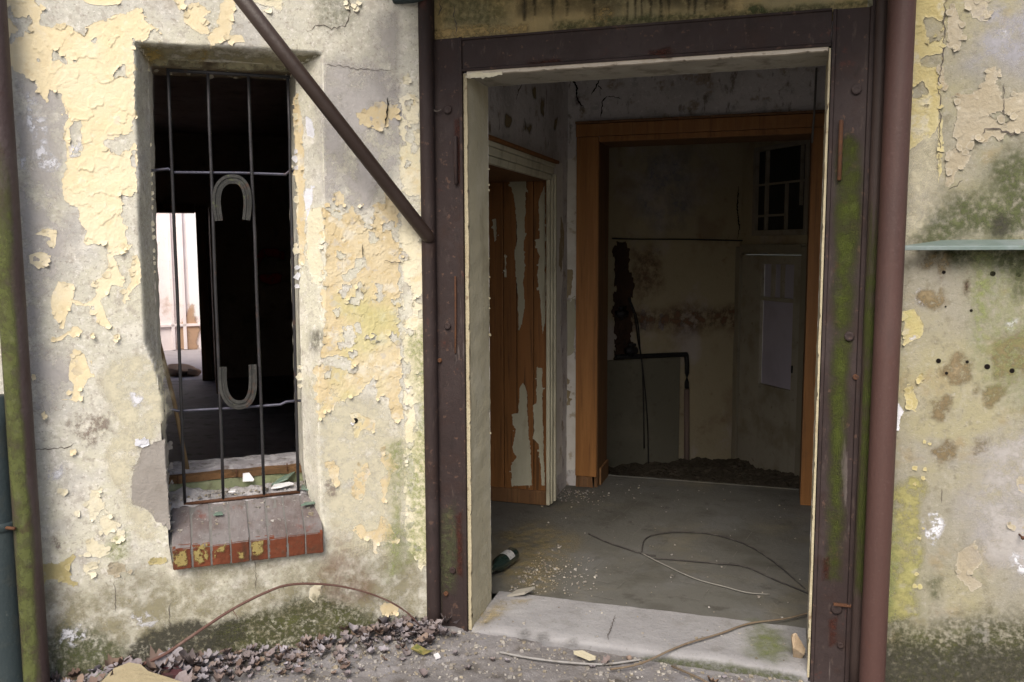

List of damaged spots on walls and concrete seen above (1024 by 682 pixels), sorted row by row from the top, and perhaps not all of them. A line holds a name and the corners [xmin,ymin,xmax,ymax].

crack [572,80,620,117]
crack [938,1,961,189]
peeling [910,0,1024,187]
peeling [7,0,172,402]
peeling [291,73,426,571]
peeling [502,155,577,487]
water stain [102,357,168,492]
spalling [130,424,174,530]
water stain [52,388,421,673]
water stain [925,513,943,540]
water stain [974,438,1024,573]
water stain [885,648,1024,682]